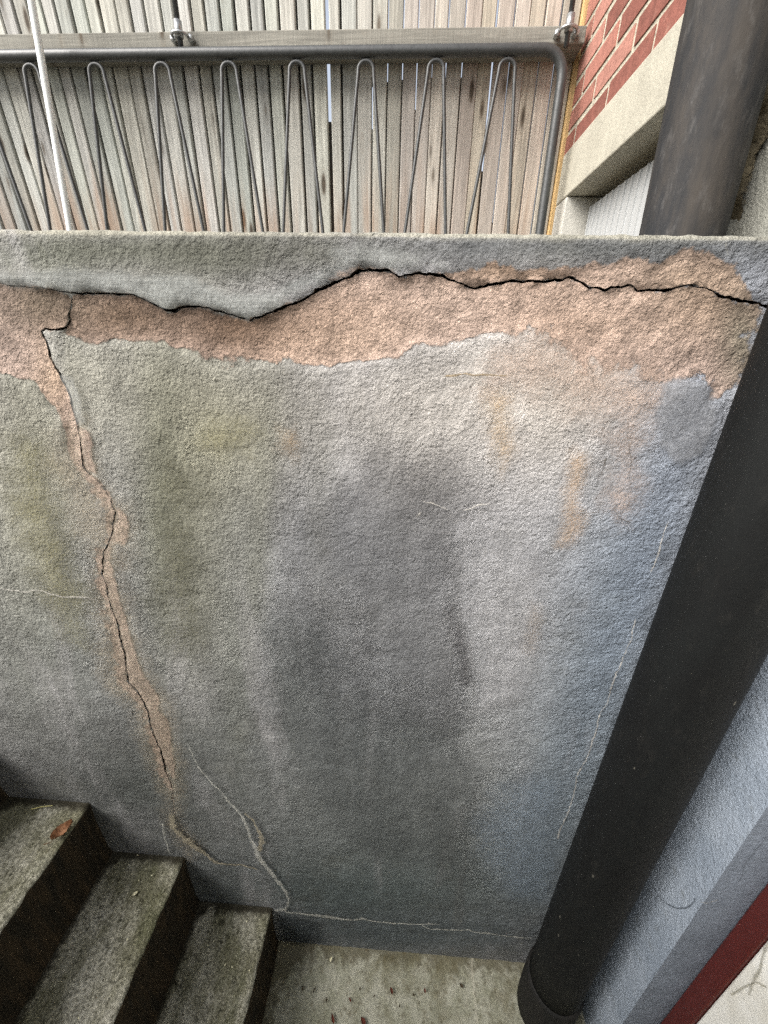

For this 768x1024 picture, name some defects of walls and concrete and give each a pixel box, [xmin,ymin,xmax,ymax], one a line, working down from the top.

spalling [0,247,762,797]
crack [0,268,767,938]